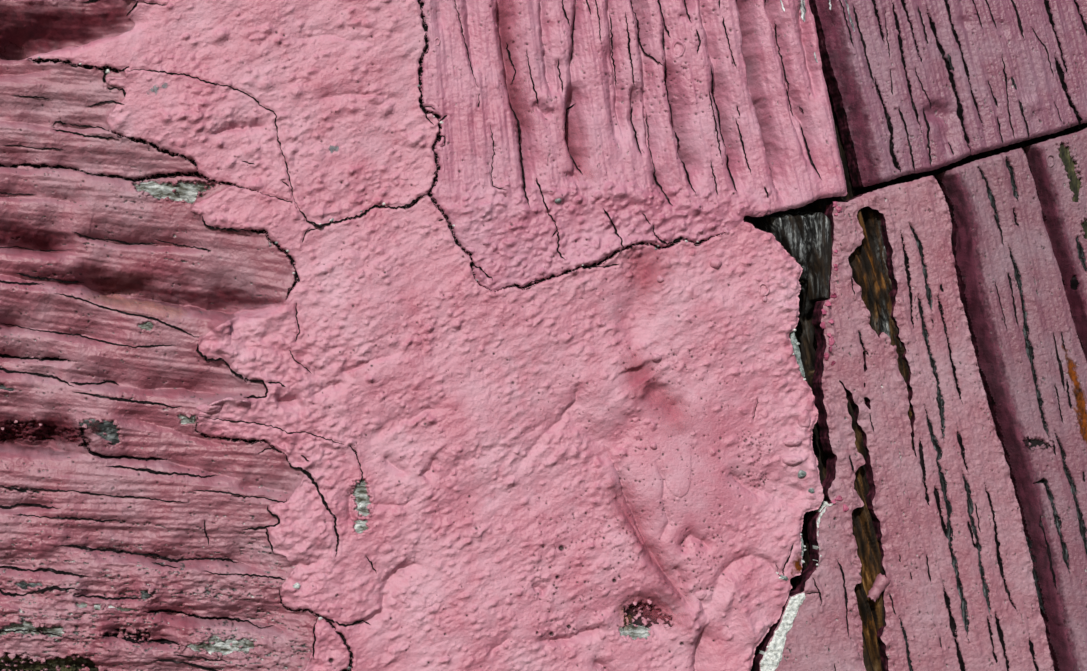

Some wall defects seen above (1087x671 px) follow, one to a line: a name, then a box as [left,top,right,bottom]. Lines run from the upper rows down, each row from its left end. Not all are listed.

peeling [133,178,214,204]
peeling [1056,141,1082,202]
crack [0,0,726,556]
peeling [867,573,891,603]
crack [279,590,370,671]
peeling [619,600,673,640]